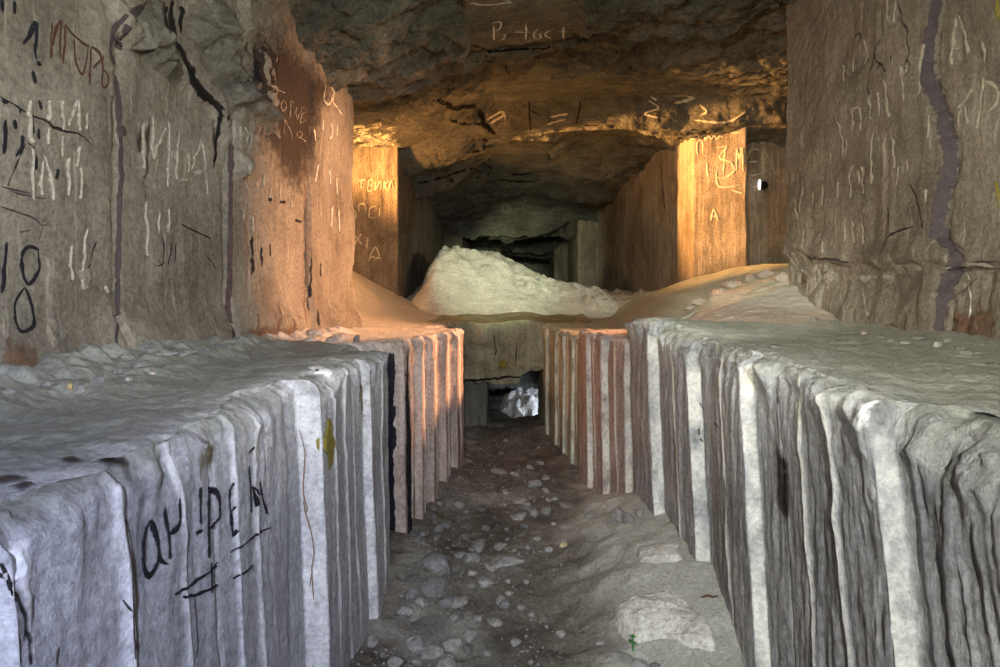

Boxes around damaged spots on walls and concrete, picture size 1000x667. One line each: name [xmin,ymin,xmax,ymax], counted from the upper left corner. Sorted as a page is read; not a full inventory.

crack [1,97,91,144]
crack [110,0,235,343]